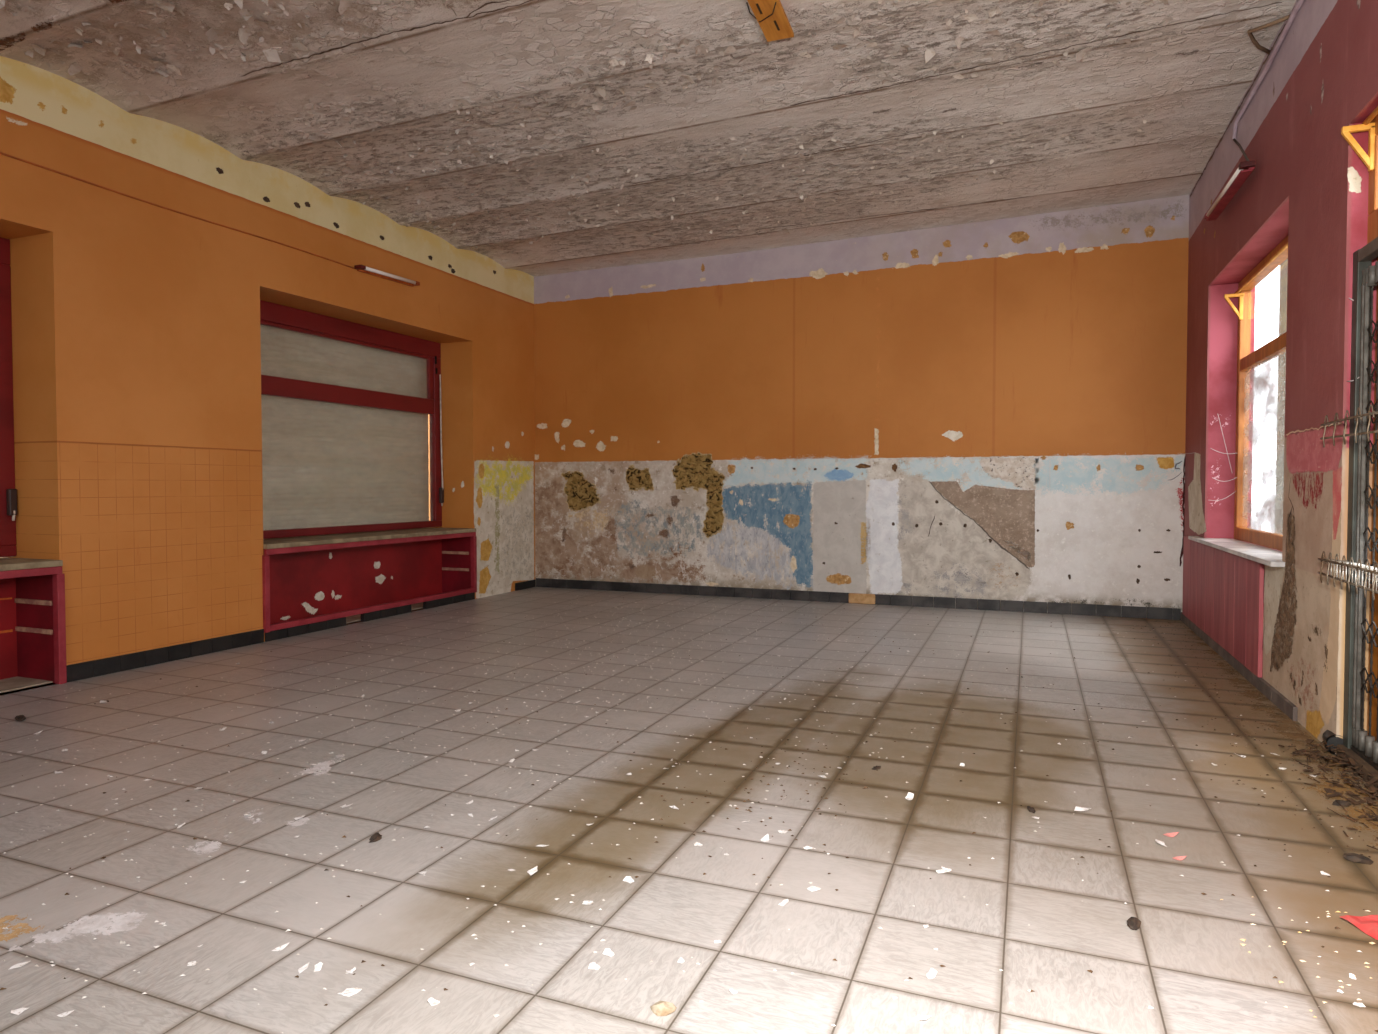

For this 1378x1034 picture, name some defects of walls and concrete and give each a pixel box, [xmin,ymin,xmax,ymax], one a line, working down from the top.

peeling [0,0,496,90]
peeling [0,76,17,104]
peeling [191,0,1223,264]
peeling [882,240,952,269]
peeling [281,591,342,620]
peeling [374,561,393,584]
flaking render [452,419,618,598]
flaking render [625,464,654,492]
flaking render [672,452,725,539]
flaking render [783,514,800,529]
flaking render [898,455,1058,600]
flaking render [1263,423,1344,705]